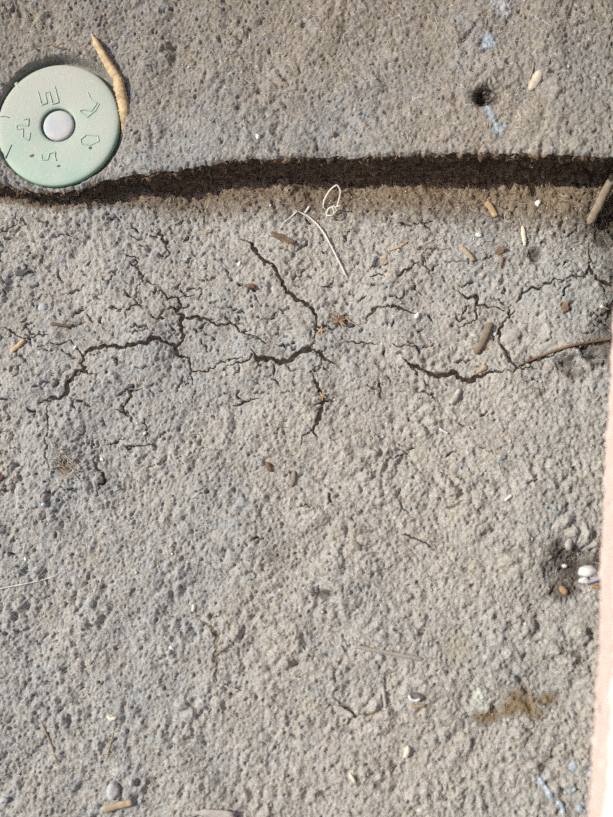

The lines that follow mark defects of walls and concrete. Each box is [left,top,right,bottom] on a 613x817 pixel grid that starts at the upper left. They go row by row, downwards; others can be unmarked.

crack [3,221,613,468]
crack [93,388,157,497]
crack [444,500,463,510]